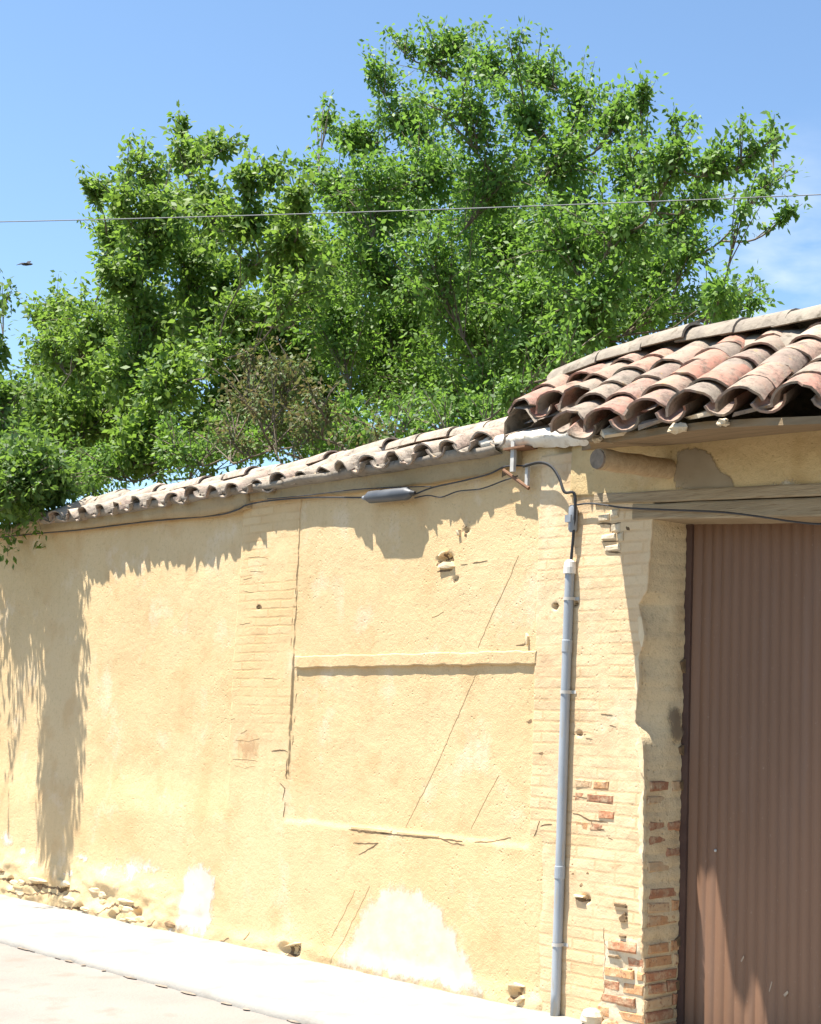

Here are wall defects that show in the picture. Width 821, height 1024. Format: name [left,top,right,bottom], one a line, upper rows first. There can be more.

spalling [436,551,459,583]
crack [478,555,519,647]
flaking render [598,509,624,552]
flaking render [633,616,647,695]
crack [350,672,551,853]
flaking render [0,833,144,923]
leakage [169,864,215,938]
crack [330,886,370,962]
flaking render [597,737,684,1024]